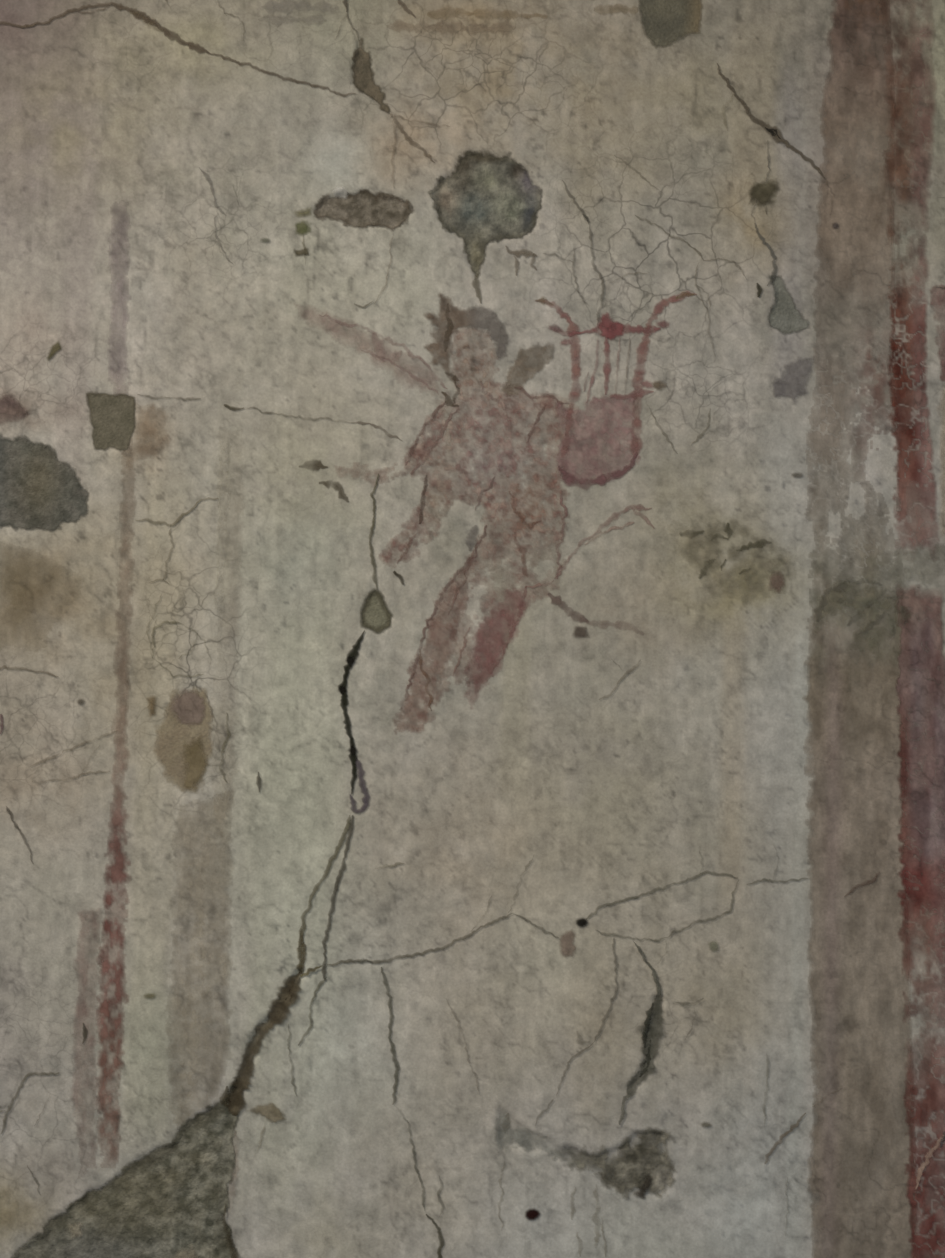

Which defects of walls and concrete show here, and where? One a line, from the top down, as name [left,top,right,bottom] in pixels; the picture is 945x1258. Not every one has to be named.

crack [0,2,349,96]
crack [717,64,825,178]
spalling [314,187,412,230]
spalling [429,151,542,304]
crack [755,224,777,297]
crack [220,630,559,1116]
crack [552,872,804,1125]
spalling [12,1084,238,1258]
peeling [252,1103,284,1131]
crack [412,1145,444,1258]
crack [915,1132,945,1189]